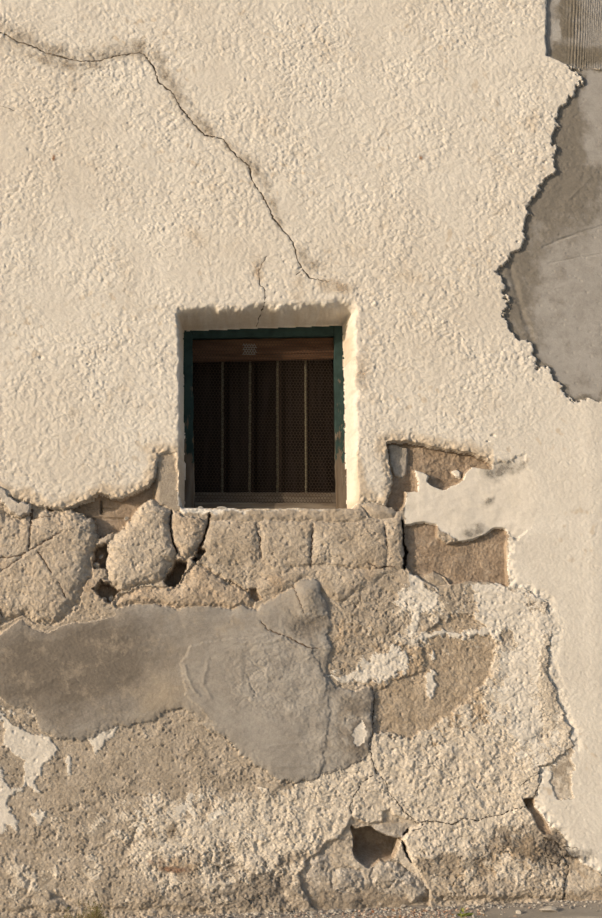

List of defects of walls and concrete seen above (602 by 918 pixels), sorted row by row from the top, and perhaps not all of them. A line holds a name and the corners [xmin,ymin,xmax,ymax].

crack [0,32,329,282]
crack [0,509,66,598]
crack [170,511,211,560]
crack [308,524,316,565]
crack [367,520,408,569]
spalling [0,443,575,801]
peeling [0,706,72,834]
peeling [117,790,269,854]
spalling [301,808,431,910]
crack [349,685,542,861]
spalling [523,798,551,836]
crack [543,837,577,900]